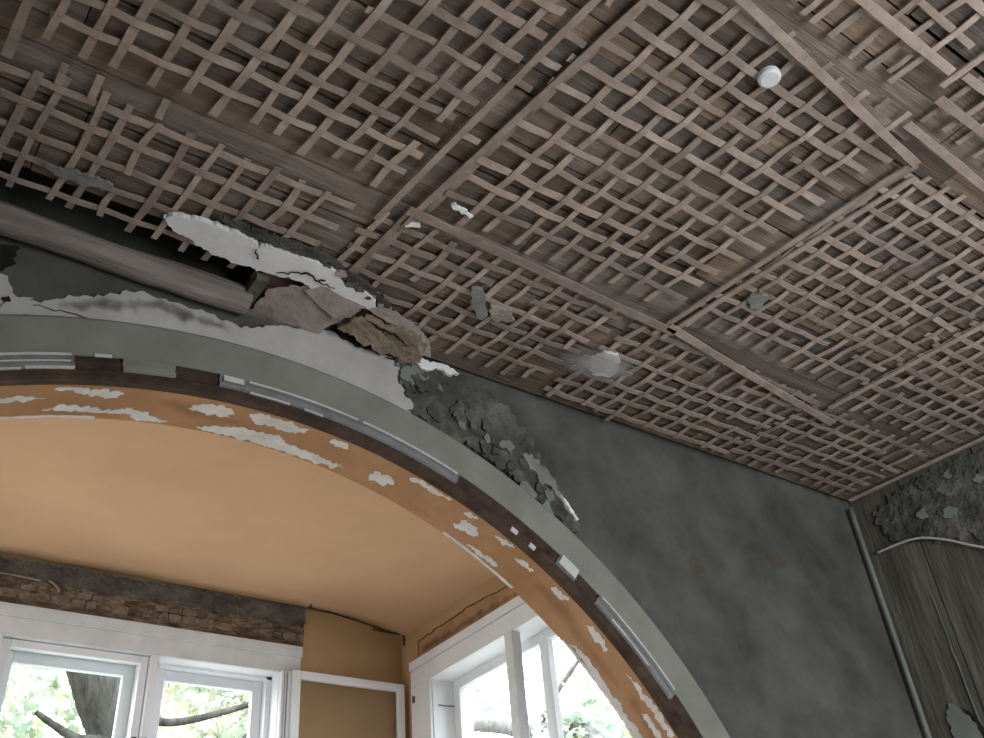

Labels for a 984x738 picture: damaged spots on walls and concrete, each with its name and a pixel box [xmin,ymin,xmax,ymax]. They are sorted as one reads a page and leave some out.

crack [254,250,335,289]
flaking render [217,215,393,311]
peeling [0,352,75,371]
peeling [0,387,168,423]
peeling [188,404,343,469]
peeling [223,375,458,475]
flaking render [333,329,581,533]
flaking render [0,555,306,647]
peeling [443,512,513,588]
peeling [558,555,580,579]
peeling [561,639,674,738]
peeling [946,703,984,738]